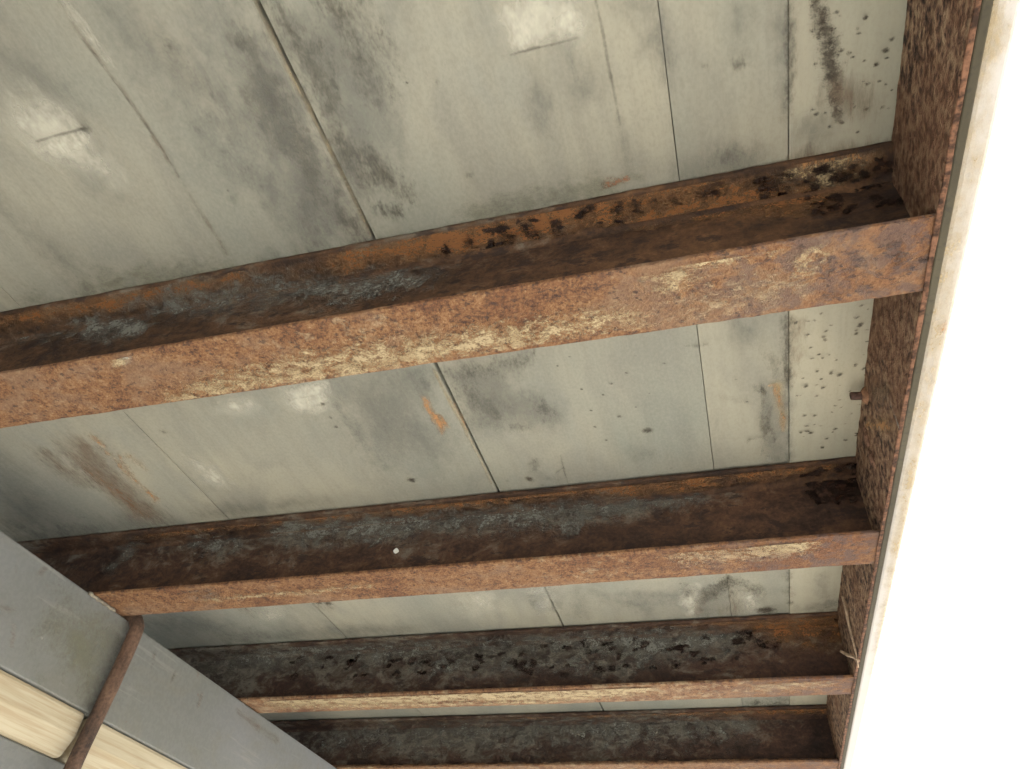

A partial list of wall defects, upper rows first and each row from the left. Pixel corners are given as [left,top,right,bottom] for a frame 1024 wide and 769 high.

leakage [812,0,852,121]
rust [327,154,904,275]
rust [1,271,249,325]
rust [75,436,159,520]
rust [298,463,861,524]
rust [472,646,570,676]
rust [541,630,781,673]
rust [840,596,860,668]